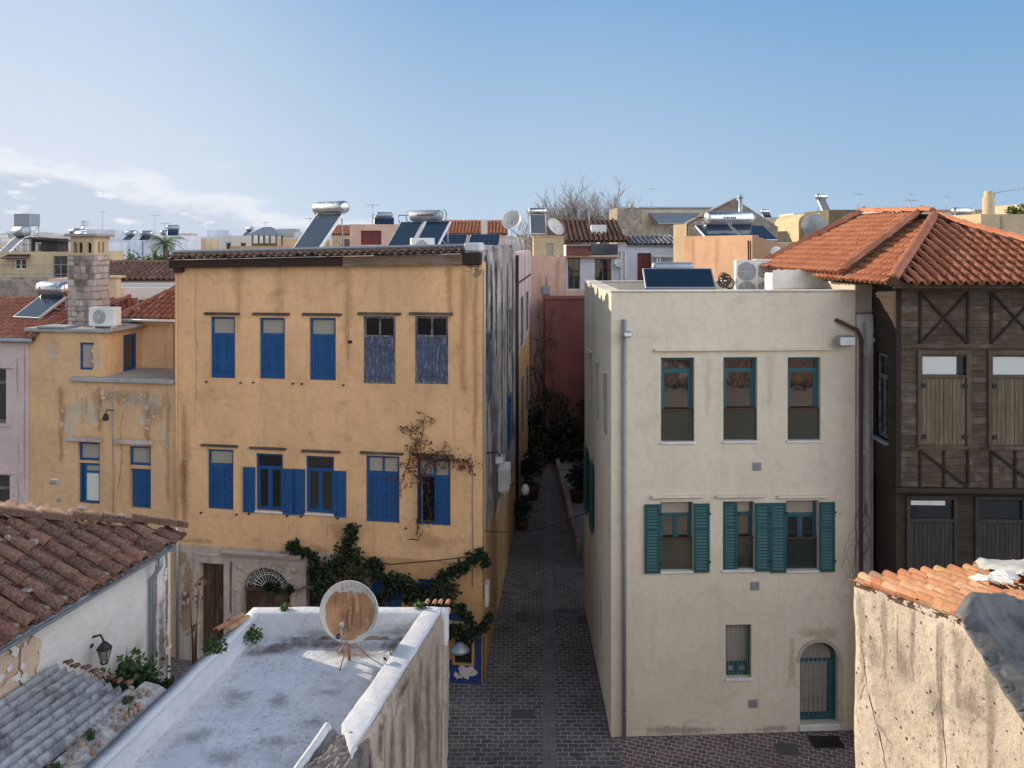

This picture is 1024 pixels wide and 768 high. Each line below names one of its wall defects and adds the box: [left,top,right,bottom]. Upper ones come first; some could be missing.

peeling [59,391,170,448]
peeling [0,633,42,699]
crack [859,647,892,765]